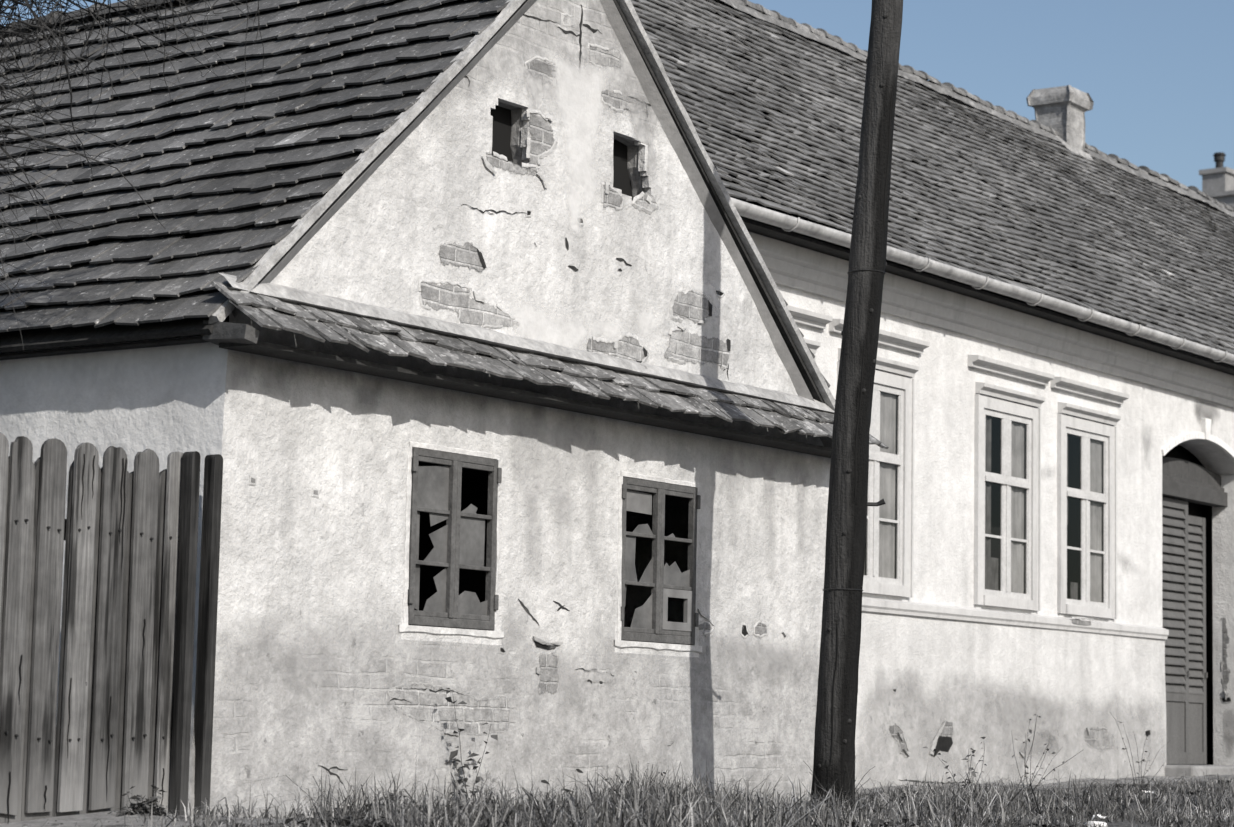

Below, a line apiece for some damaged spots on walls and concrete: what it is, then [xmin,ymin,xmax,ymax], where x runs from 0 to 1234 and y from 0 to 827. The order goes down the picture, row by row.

crack [523,5,602,73]
peeling [443,0,660,230]
flaking render [418,242,652,363]
flaking render [665,287,731,370]
flaking render [533,636,563,695]
spalling [889,723,910,758]
spalling [929,721,953,757]